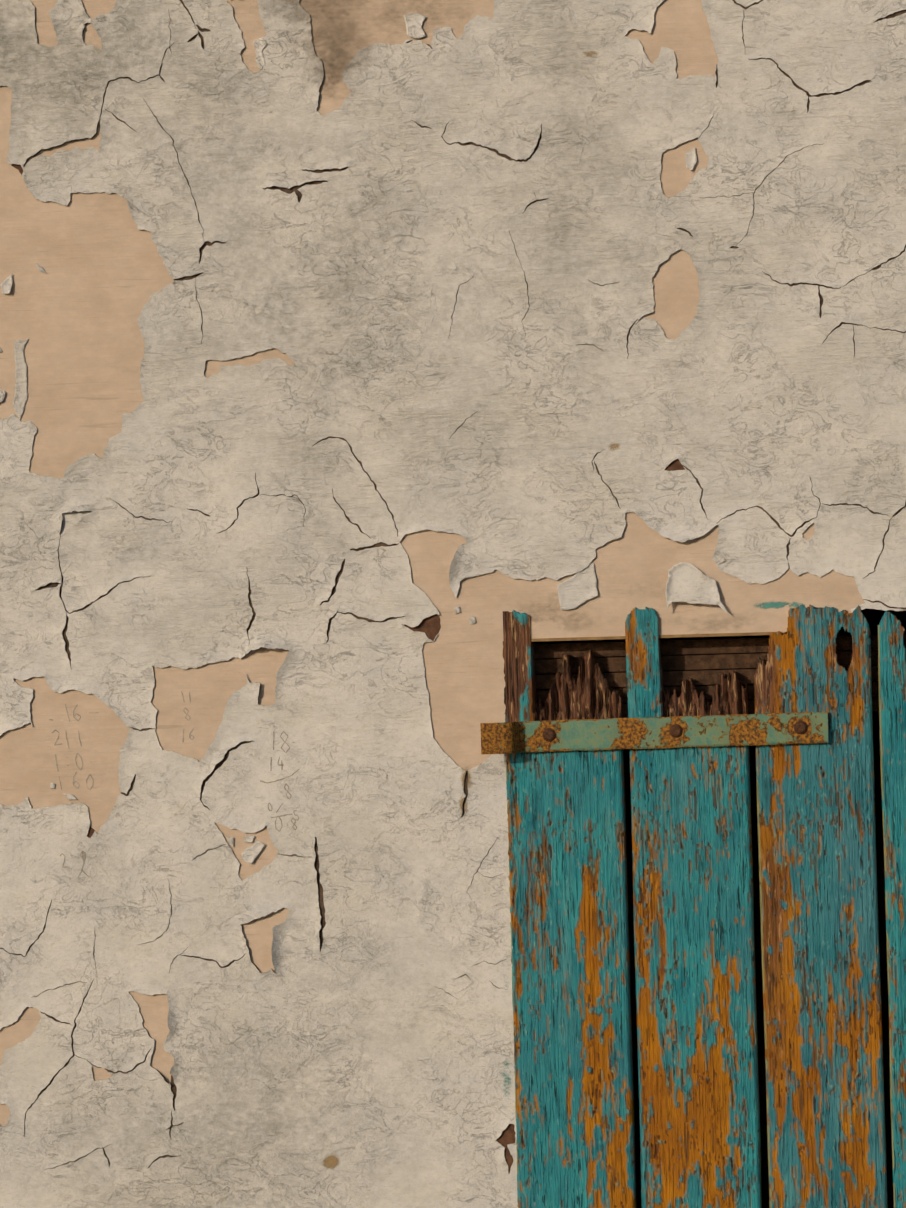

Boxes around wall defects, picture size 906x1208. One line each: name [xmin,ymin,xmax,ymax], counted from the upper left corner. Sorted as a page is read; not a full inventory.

peeling [623,0,719,79]
crack [706,0,874,249]
peeling [0,80,174,478]
crack [762,238,906,356]
peeling [0,670,132,838]
crack [32,543,153,665]
peeling [148,630,299,764]
crack [313,436,410,644]
peeling [396,507,865,771]
peeling [234,900,296,979]
crack [281,831,326,955]
crack [24,935,153,1135]